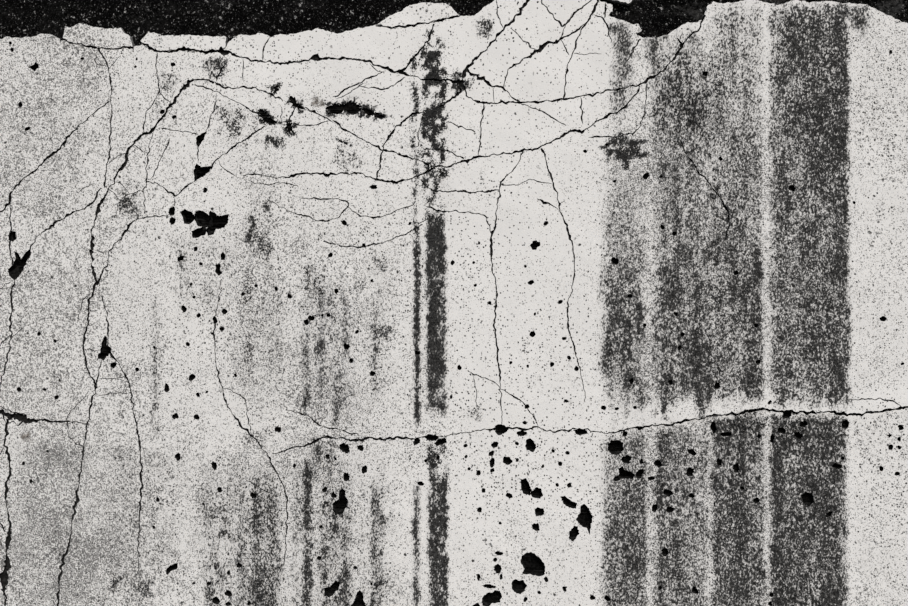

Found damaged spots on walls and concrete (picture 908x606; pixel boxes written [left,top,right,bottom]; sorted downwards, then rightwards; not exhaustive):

crack [0,0,706,606]
damp [409,29,450,426]
damp [410,444,451,606]
damp [597,1,871,606]
crack [583,398,908,434]